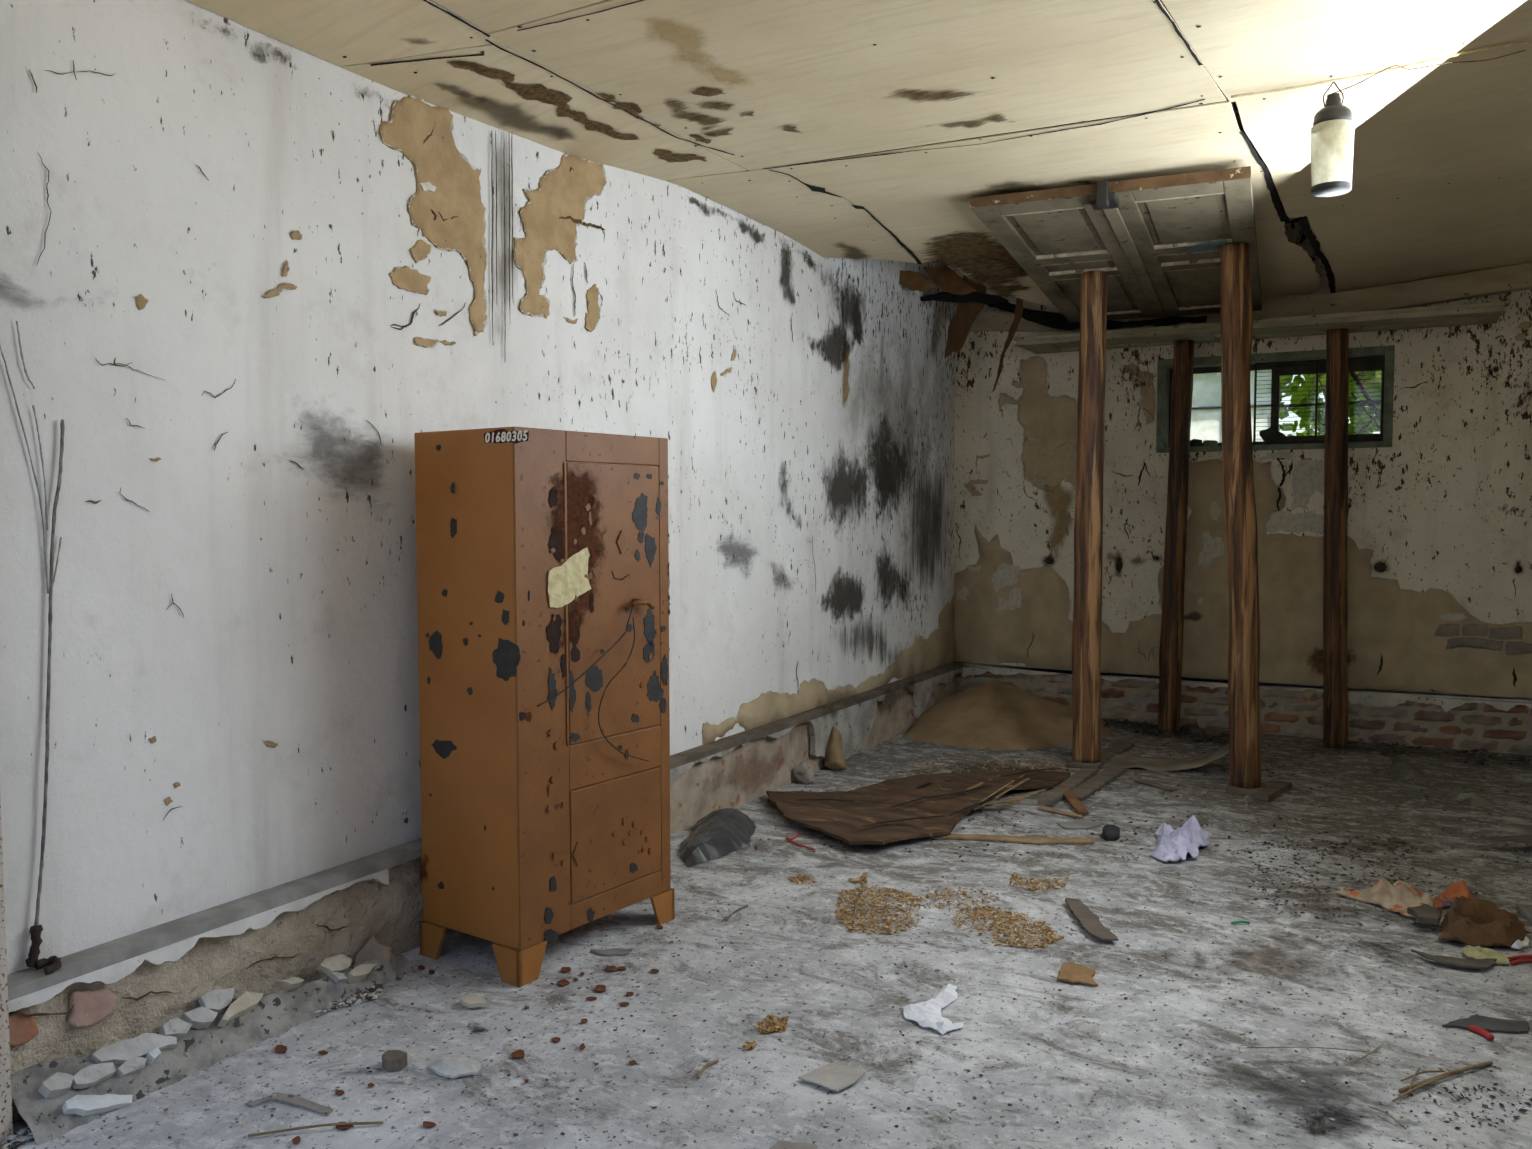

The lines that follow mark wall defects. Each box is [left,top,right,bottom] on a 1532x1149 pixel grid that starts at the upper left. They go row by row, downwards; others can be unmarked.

peeling [379,95,487,337]
water stain [441,60,660,340]
peeling [513,154,607,332]
water stain [653,22,754,162]
peeling [670,525,1073,835]
water stain [821,384,942,661]
peeling [998,356,1078,501]
peeling [1100,565,1164,725]
peeling [1180,459,1229,731]
peeling [1253,450,1324,738]
peeling [1347,536,1532,755]
spalling [9,857,423,1075]